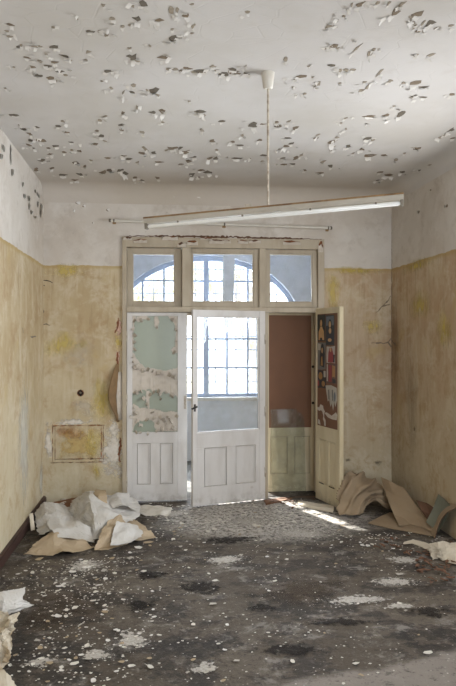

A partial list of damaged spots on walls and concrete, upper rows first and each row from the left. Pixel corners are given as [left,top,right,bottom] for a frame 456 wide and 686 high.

peeling [2,23,95,88]
peeling [101,70,170,137]
peeling [86,0,196,43]
peeling [157,55,251,81]
peeling [324,1,407,32]
peeling [351,69,430,103]
peeling [407,11,455,37]
peeling [4,114,162,184]
peeling [165,99,265,181]
peeling [317,105,421,176]
peeling [130,316,178,436]
crack [372,249,397,449]